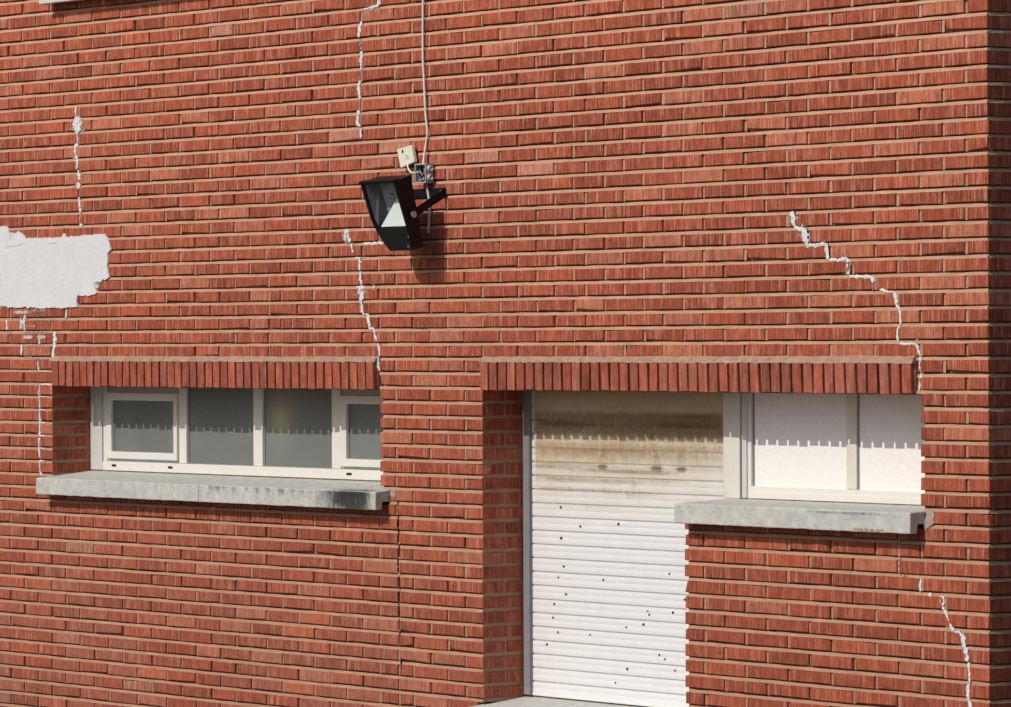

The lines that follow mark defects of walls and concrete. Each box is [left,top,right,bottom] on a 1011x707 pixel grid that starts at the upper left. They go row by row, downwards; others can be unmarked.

crack [355,0,381,139]
crack [72,107,84,228]
crack [342,229,381,371]
crack [785,211,923,391]
crack [5,309,68,476]
leakage [535,391,723,462]
crack [898,538,972,707]